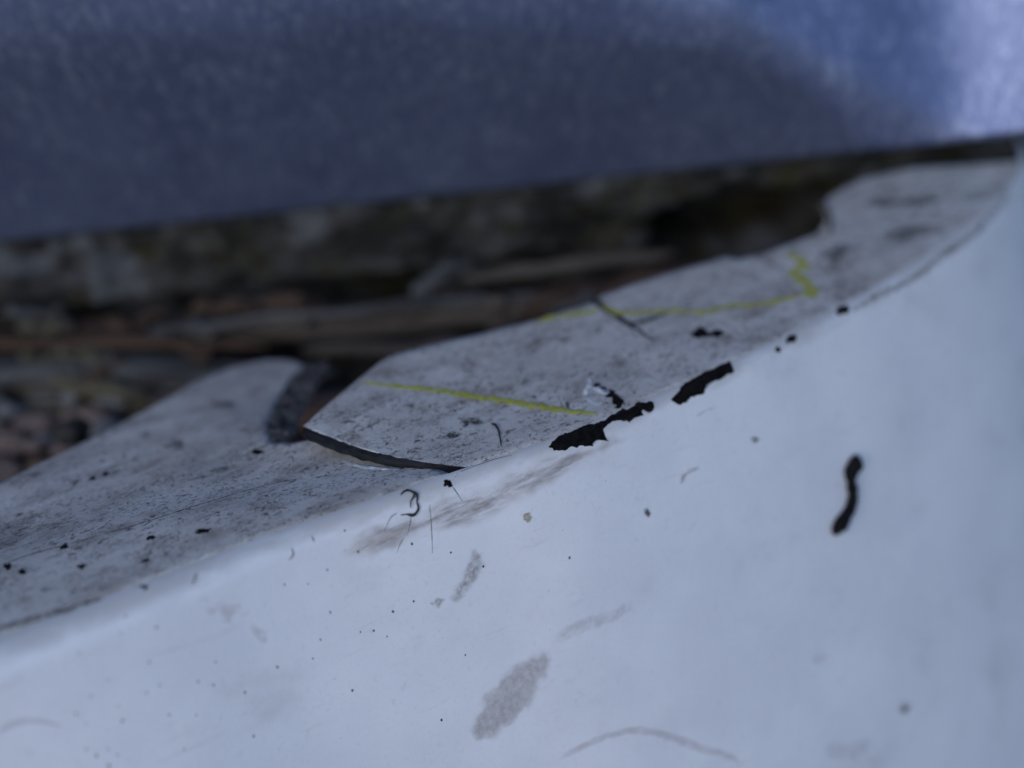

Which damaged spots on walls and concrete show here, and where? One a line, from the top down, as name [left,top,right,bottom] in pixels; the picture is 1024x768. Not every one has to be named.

peeling [691,326,725,338]
peeling [835,305,850,316]
peeling [671,361,734,405]
spalling [251,361,328,455]
peeling [549,378,656,451]
crack [302,426,510,471]